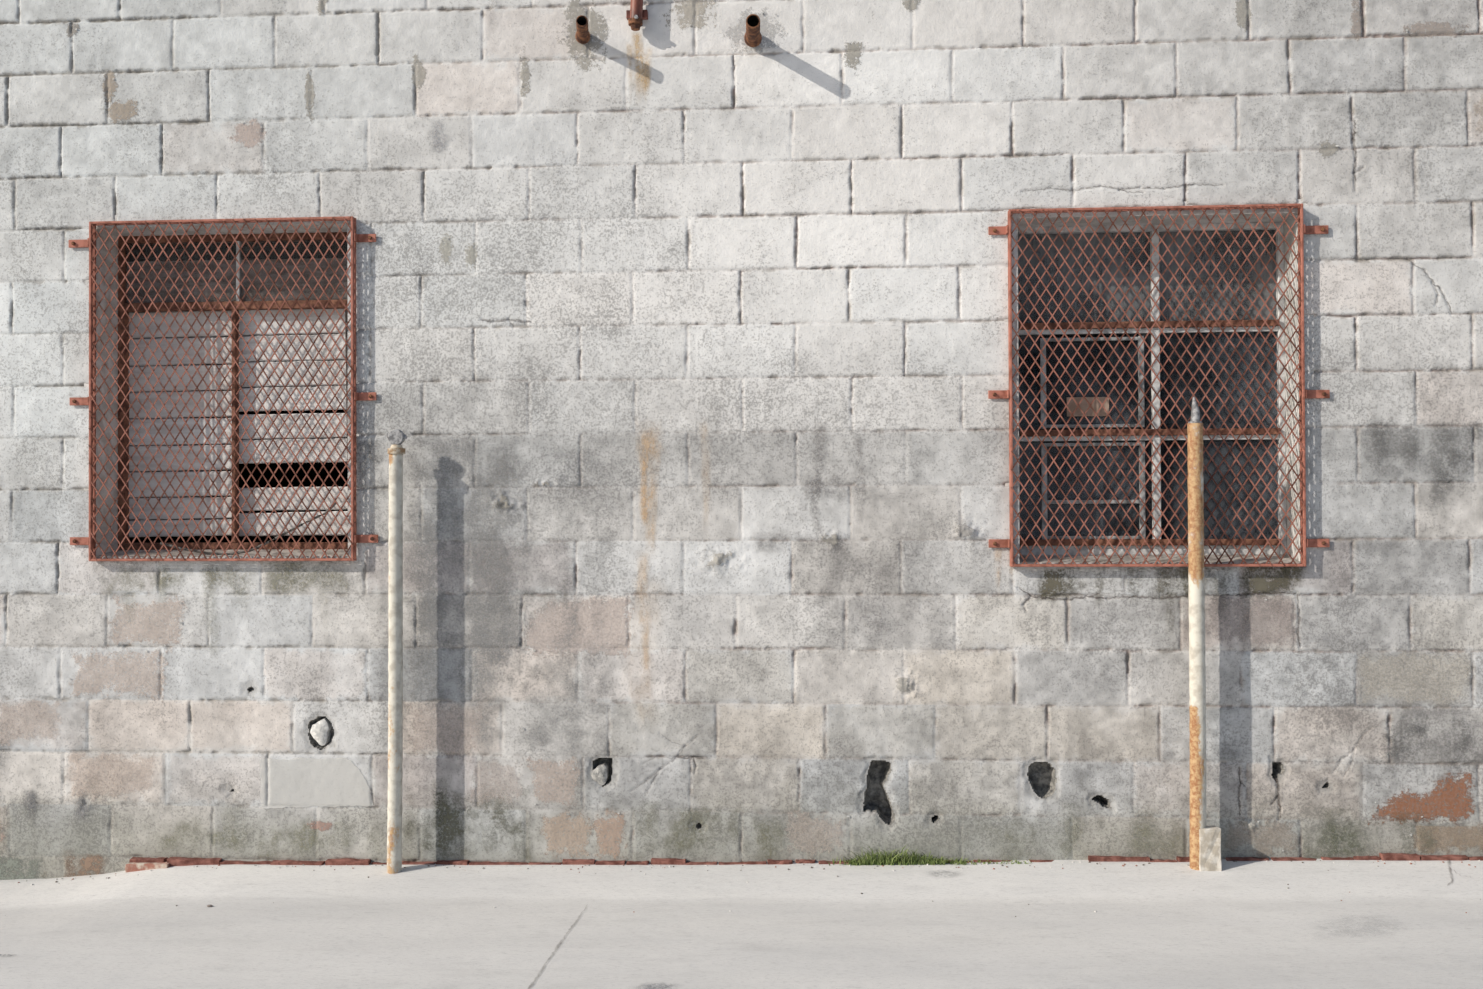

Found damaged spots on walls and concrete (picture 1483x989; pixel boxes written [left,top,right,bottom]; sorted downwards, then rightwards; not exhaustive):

water stain [1039,569,1070,599]
water stain [1158,568,1189,597]
water stain [1242,563,1303,596]
spalling [308,716,334,750]
spalling [572,756,613,787]
spalling [847,760,895,825]
spalling [1027,762,1057,798]
peeling [1368,773,1475,836]